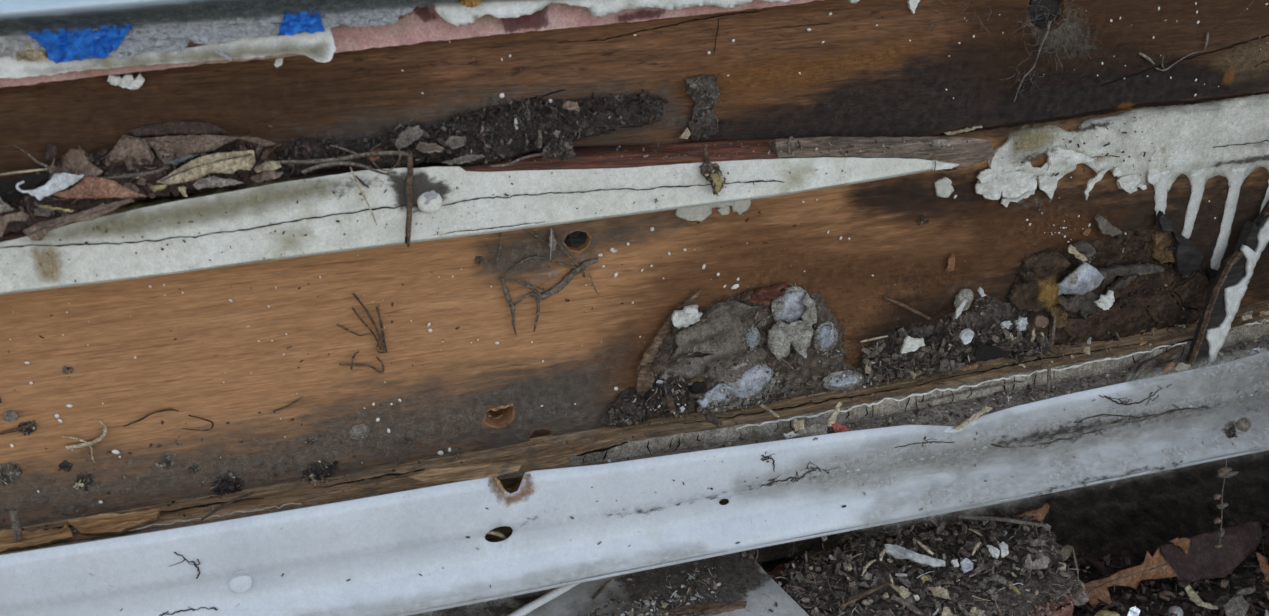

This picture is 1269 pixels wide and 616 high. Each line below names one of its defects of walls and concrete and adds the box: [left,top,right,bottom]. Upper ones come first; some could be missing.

crack [934,35,1269,172]
damp [0,168,1269,527]
corrosion [490,474,534,504]